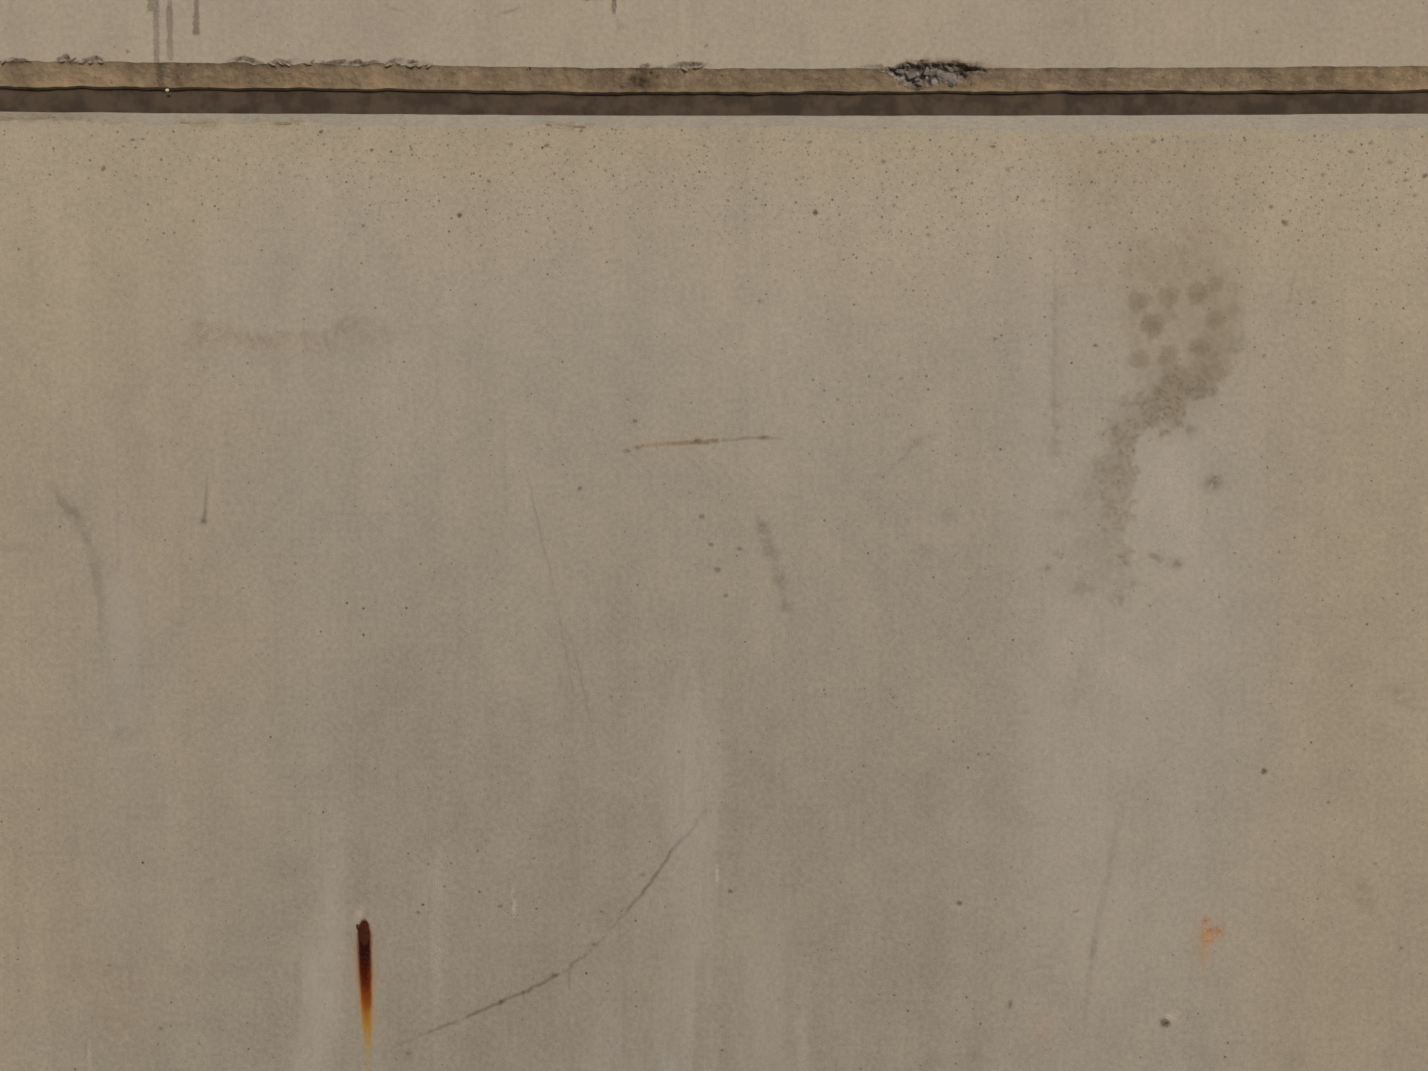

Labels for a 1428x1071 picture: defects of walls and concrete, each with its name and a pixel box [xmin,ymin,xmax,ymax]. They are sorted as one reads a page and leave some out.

spalling [864,60,992,91]
corrosion [356,920,372,1034]